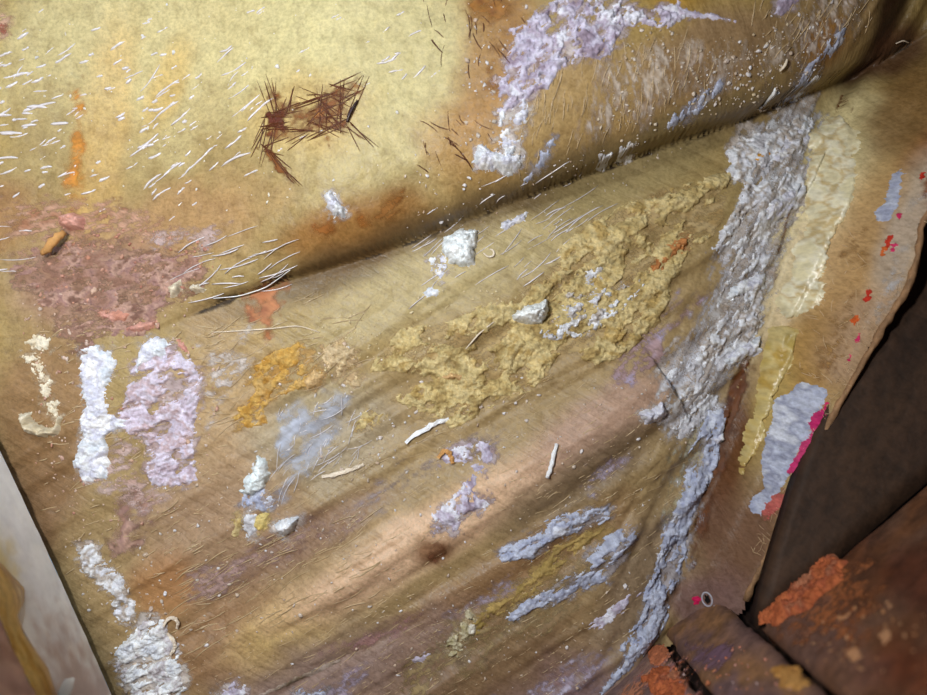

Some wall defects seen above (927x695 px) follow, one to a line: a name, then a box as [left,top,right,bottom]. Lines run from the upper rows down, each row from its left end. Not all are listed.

corrosion [251,71,378,187]
leakage [492,94,534,173]
leakage [722,359,749,438]
leakage [712,448,727,476]